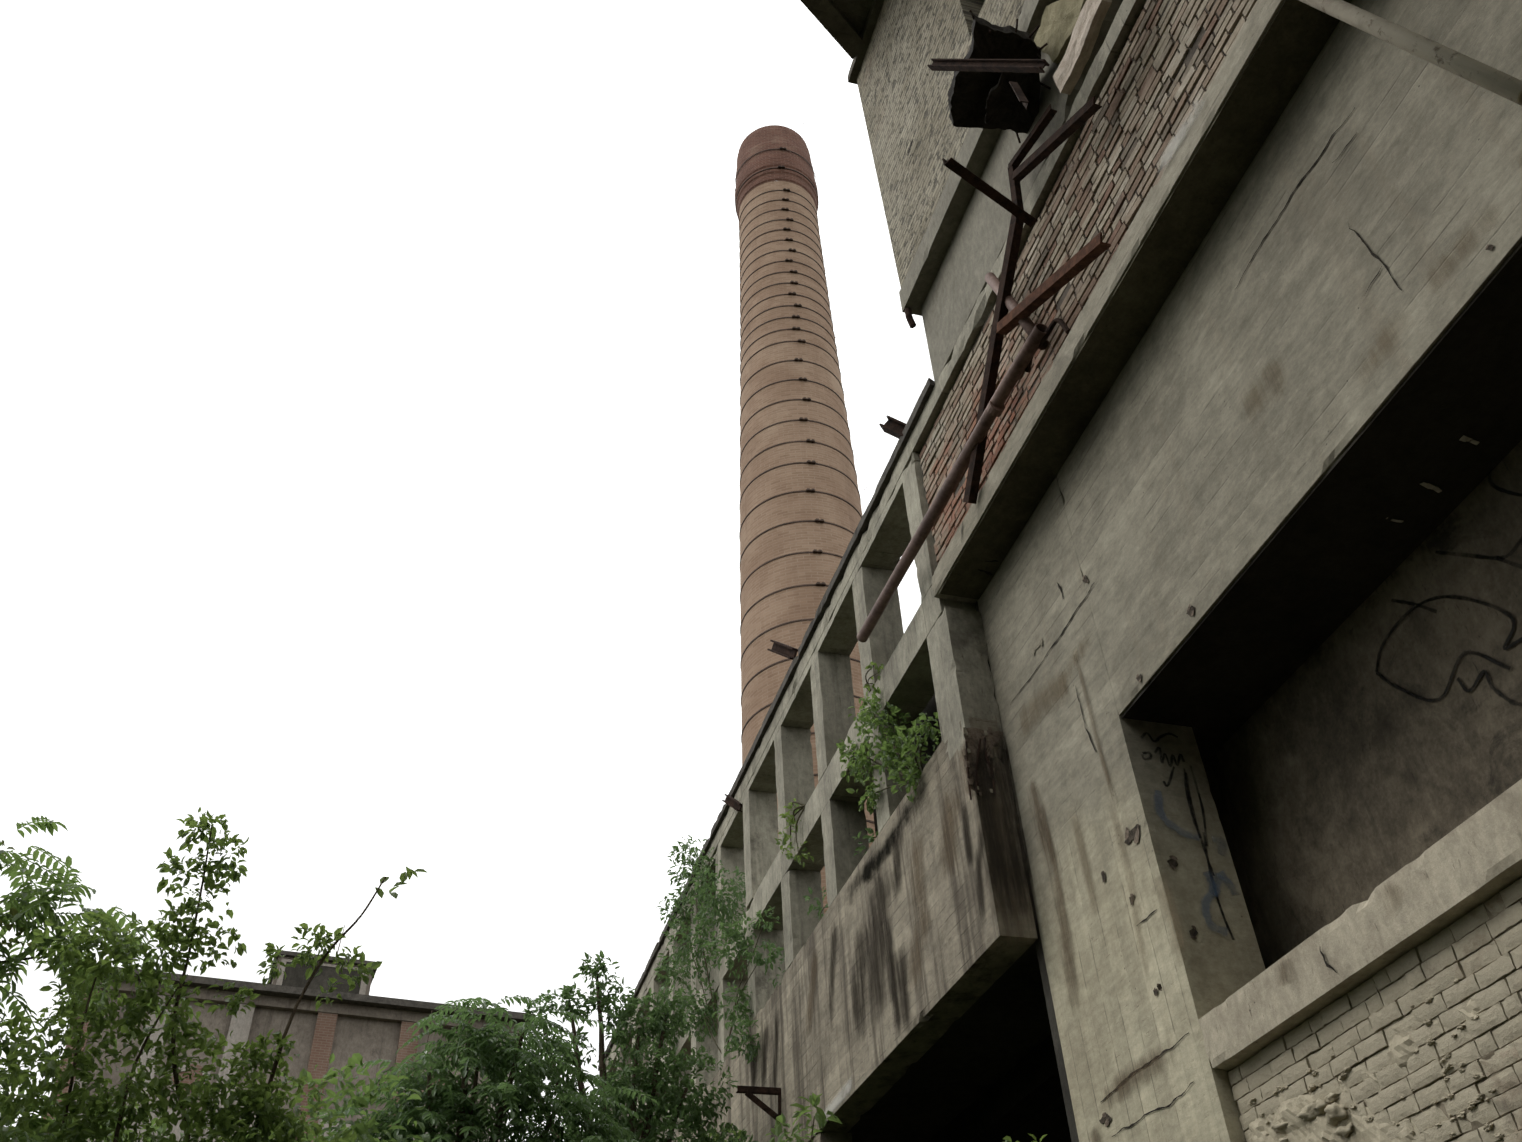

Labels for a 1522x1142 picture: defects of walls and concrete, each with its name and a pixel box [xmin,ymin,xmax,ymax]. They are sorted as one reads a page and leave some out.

crack [1236,108,1356,288]
crack [1349,228,1402,296]
damp [943,736,1073,975]
damp [851,792,926,1029]
damp [808,927,836,1019]
damp [750,1018,777,1087]
damp [825,1080,851,1116]